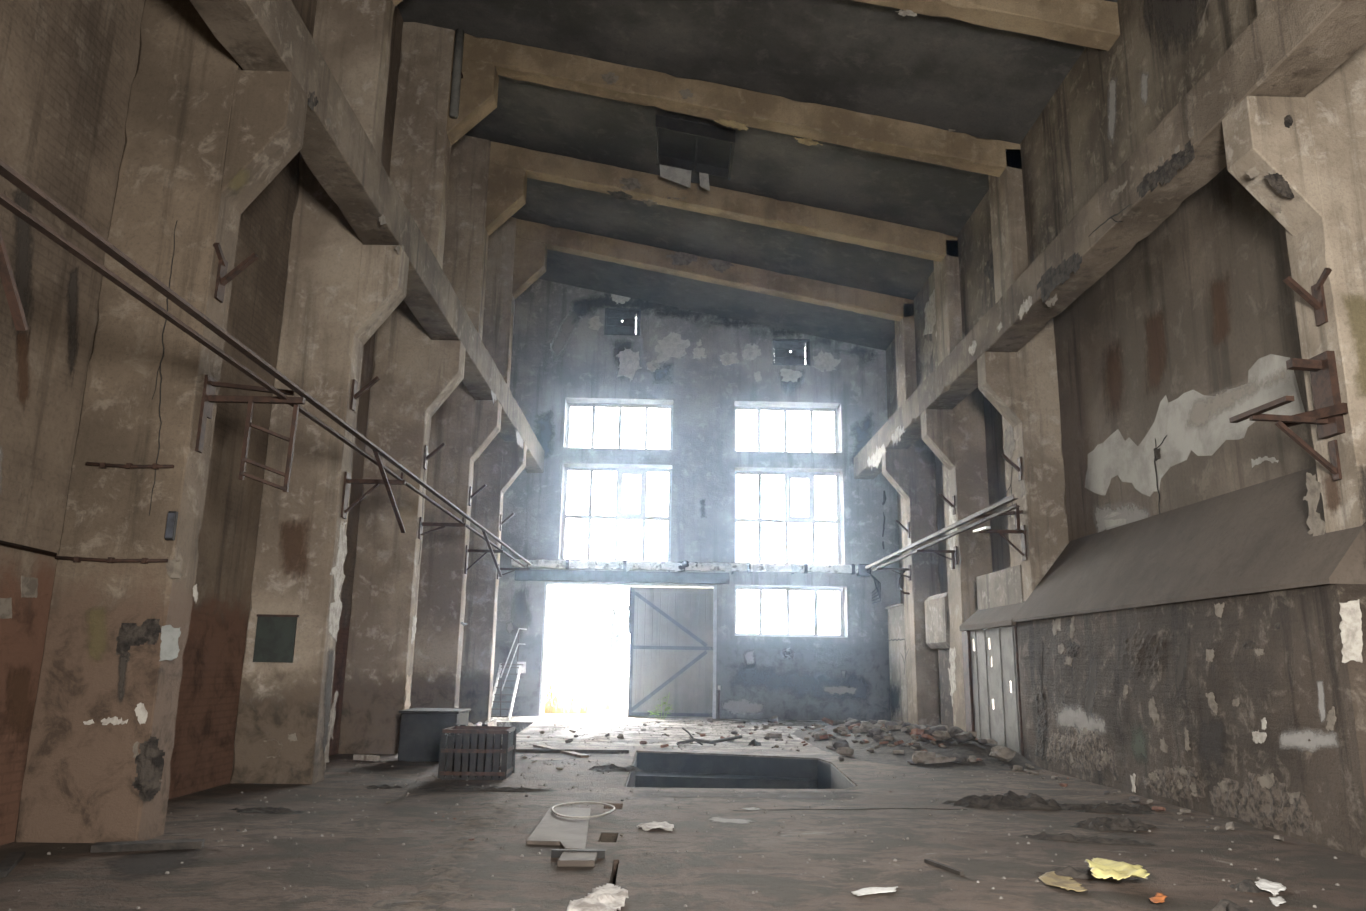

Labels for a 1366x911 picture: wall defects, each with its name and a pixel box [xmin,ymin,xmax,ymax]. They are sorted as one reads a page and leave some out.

flaking render [1085,354,1305,497]
flaking render [1104,512,1126,528]
spalling [116,619,161,662]
spalling [83,703,165,802]
damp [1058,707,1105,732]
damp [1281,682,1337,749]